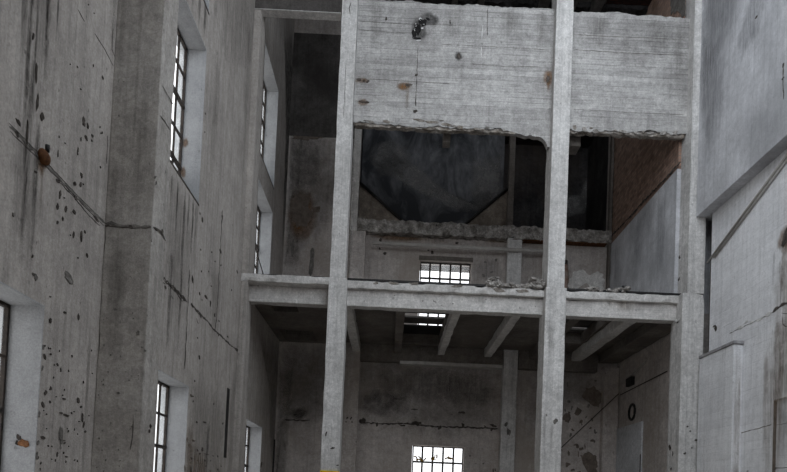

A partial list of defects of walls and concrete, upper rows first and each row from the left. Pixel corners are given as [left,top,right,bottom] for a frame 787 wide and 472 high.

spalling [386,0,552,9]
spalling [574,2,591,12]
spalling [600,0,652,16]
spalling [412,14,437,41]
spalling [354,55,516,137]
crack [9,123,166,241]
spalling [357,217,544,255]
spalling [566,228,612,247]
crack [163,210,238,368]
peeling [568,270,605,290]
crack [772,302,787,327]
peeling [546,380,601,472]